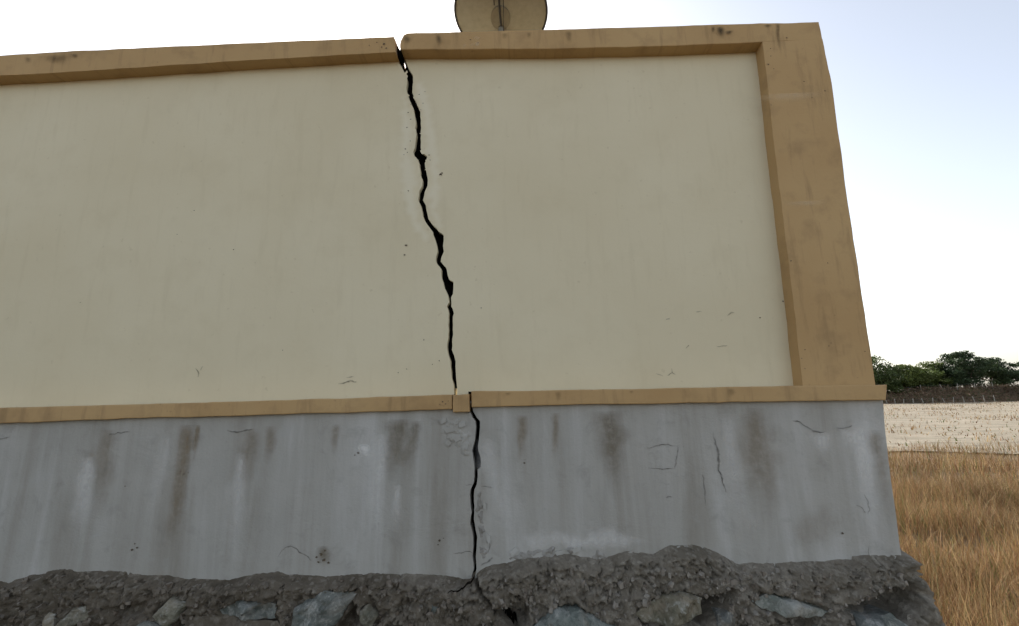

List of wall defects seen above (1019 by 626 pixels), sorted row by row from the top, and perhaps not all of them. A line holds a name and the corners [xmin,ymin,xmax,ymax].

crack [396,43,490,593]
crack [502,608,517,624]